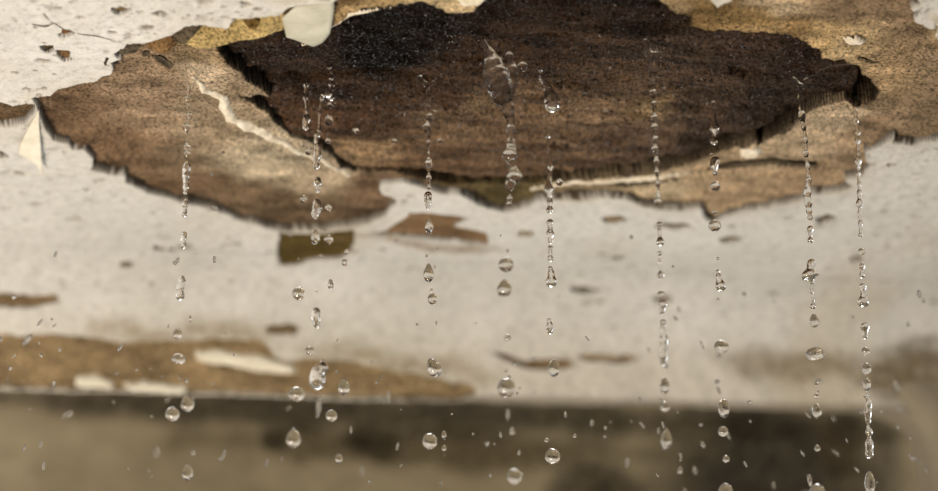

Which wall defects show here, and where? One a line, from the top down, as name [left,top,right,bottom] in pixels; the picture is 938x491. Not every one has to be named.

flaking render [0,0,938,265]